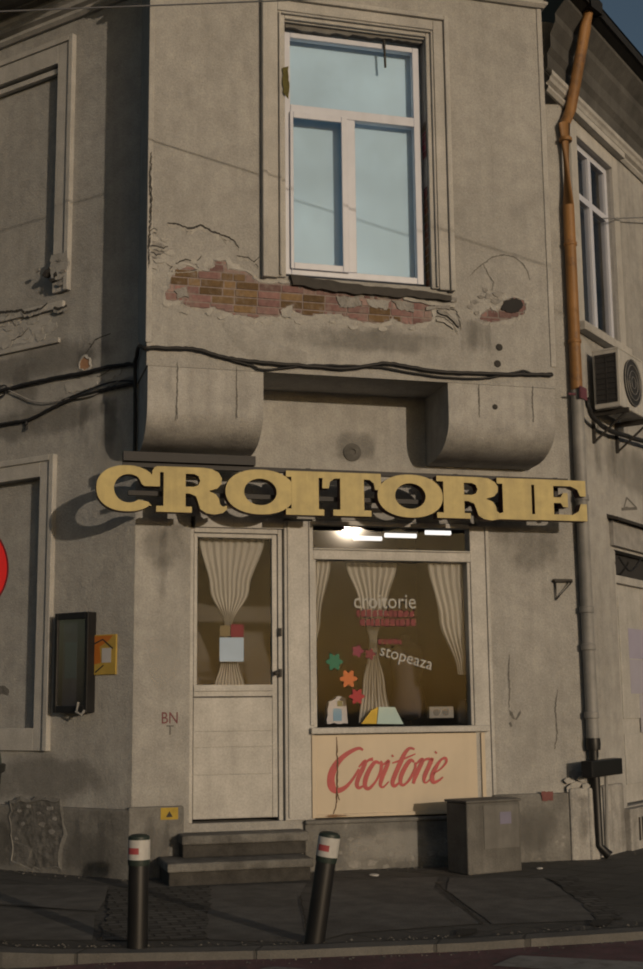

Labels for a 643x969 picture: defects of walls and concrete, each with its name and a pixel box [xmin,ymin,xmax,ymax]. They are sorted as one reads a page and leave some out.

crack [148,152,259,275]
flaking render [34,250,70,287]
flaking render [152,236,529,332]
peeling [0,314,57,349]
flaking render [78,354,93,371]